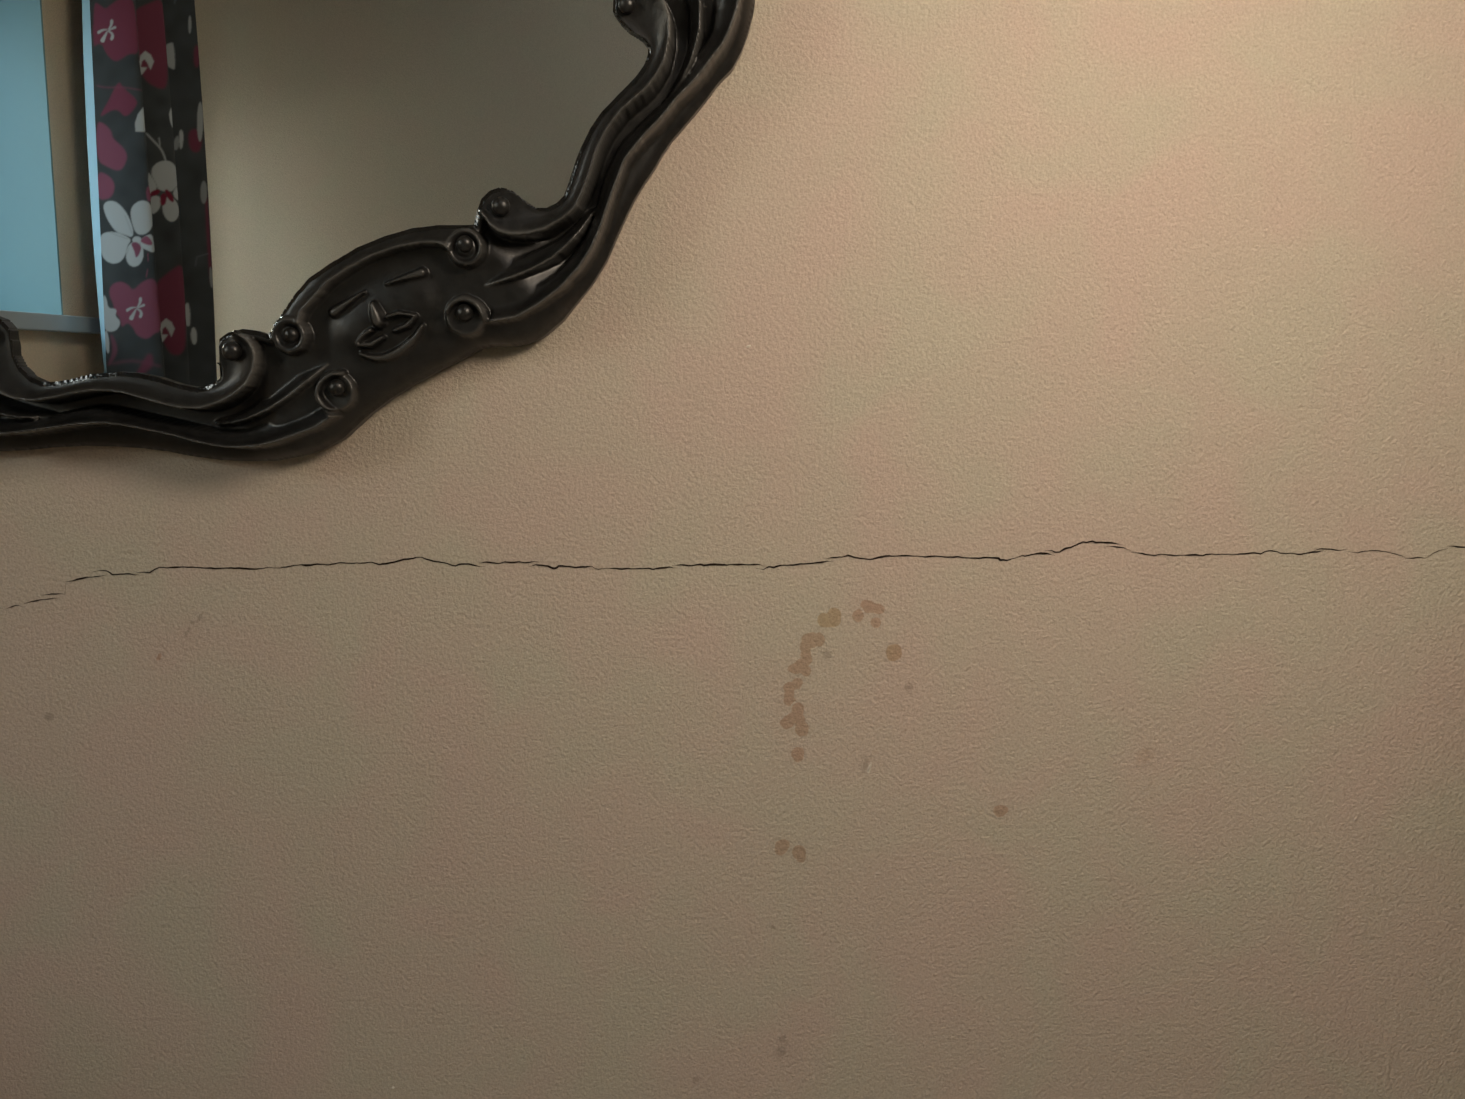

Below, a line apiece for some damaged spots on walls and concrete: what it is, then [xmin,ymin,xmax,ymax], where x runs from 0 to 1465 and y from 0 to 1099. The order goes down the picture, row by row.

crack [2,540,1465,609]
water stain [778,598,904,764]